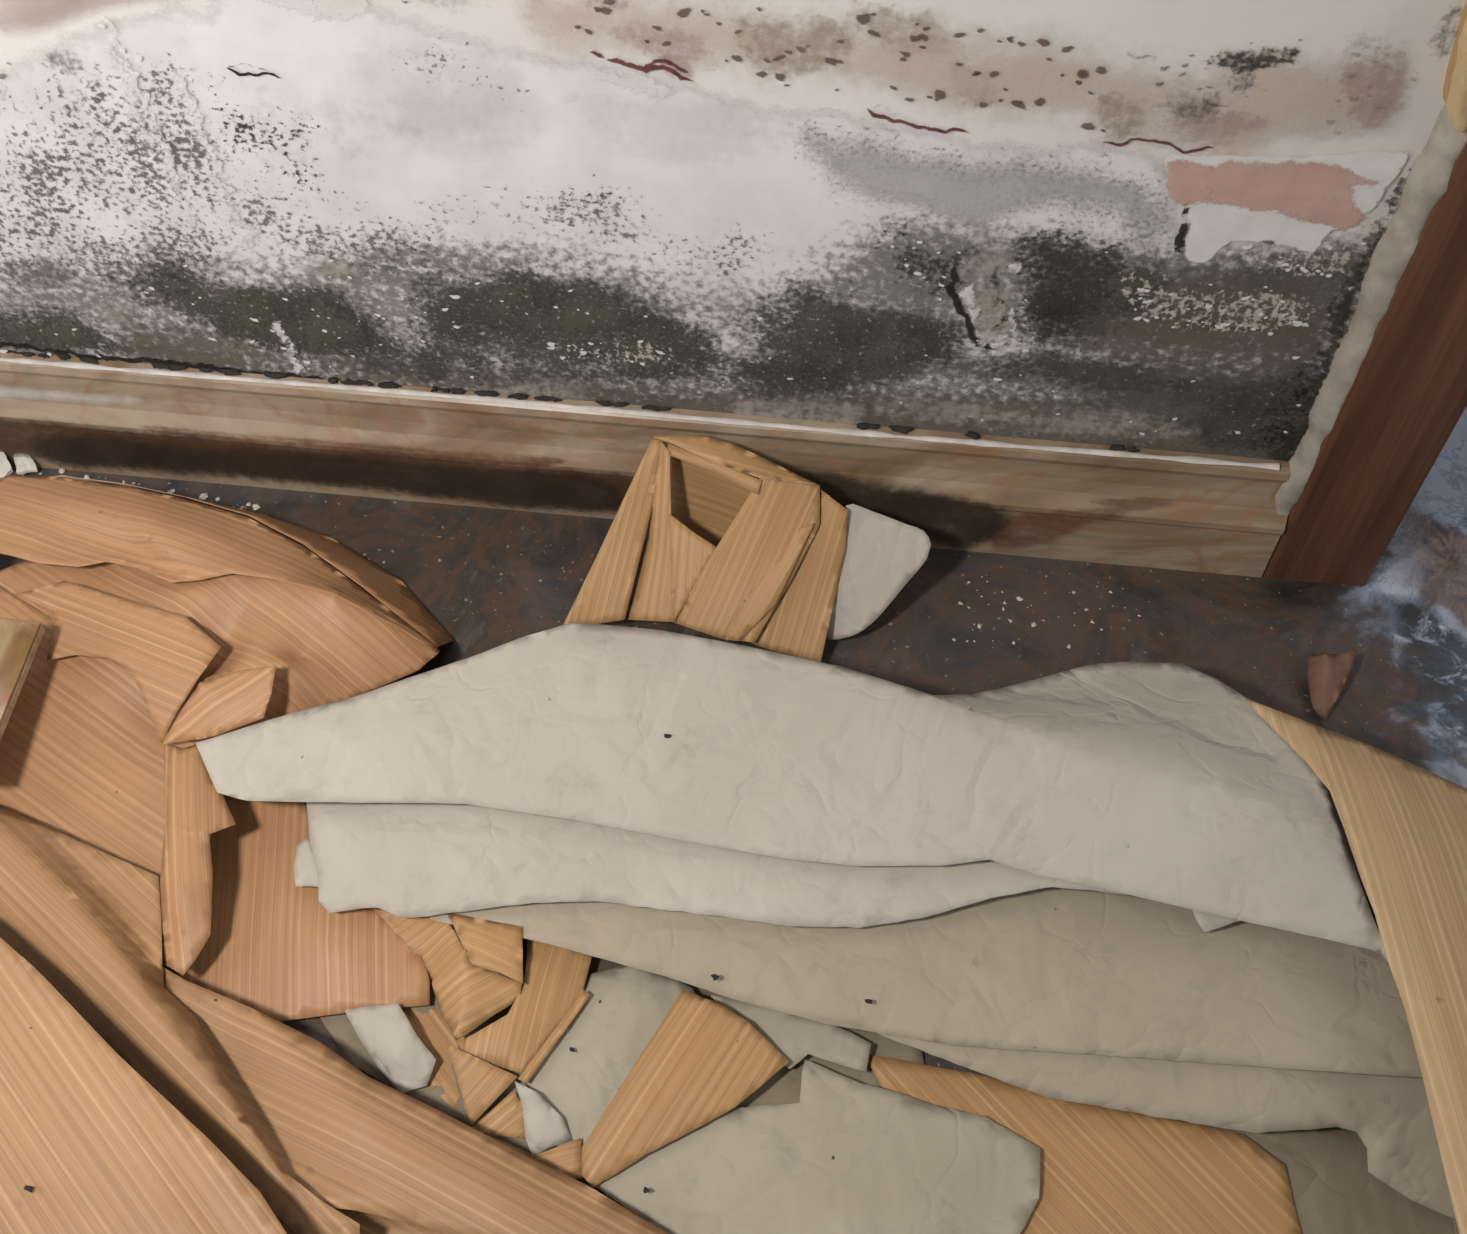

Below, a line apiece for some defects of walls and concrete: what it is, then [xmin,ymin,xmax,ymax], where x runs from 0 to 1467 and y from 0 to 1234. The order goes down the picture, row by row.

water stain [533,0,615,35]
water stain [628,7,1390,147]
water stain [0,46,1376,461]
peeling [0,0,1408,452]
spalling [0,452,38,479]
water stain [0,421,633,512]
water stain [781,466,1008,547]